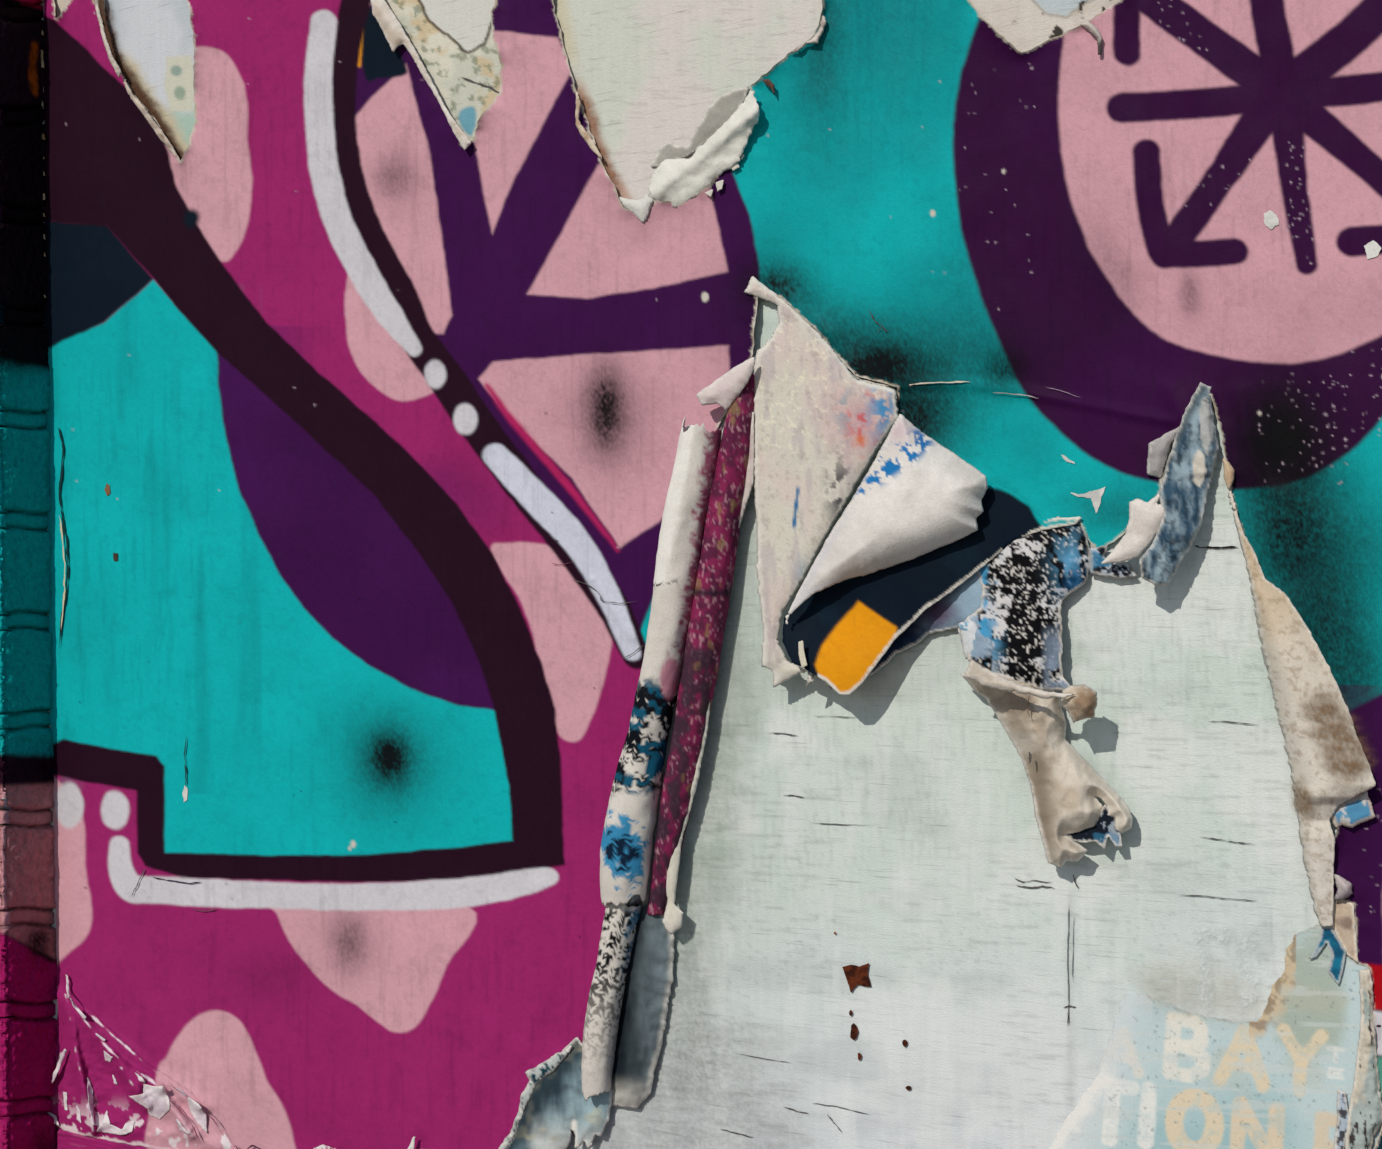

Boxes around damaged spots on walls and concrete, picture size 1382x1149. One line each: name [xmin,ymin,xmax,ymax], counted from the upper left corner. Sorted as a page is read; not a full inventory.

peeling [1071,487,1105,513]